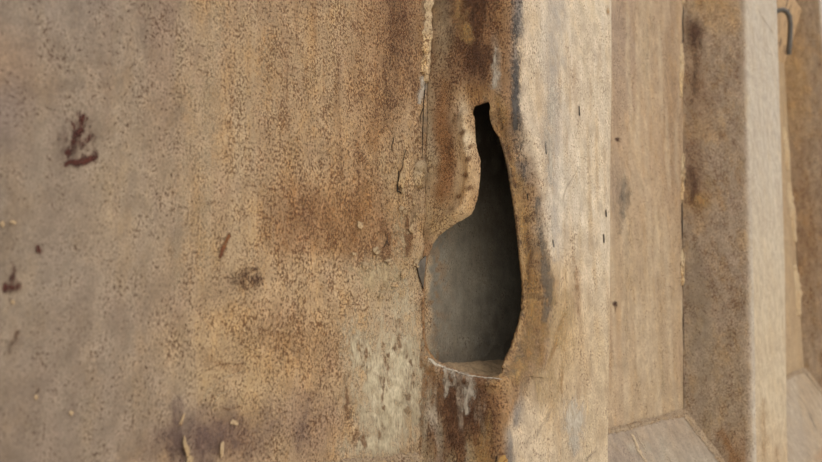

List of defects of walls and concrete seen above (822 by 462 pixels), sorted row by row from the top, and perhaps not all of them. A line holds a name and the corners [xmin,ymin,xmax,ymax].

corrosion [64,111,98,167]
corrosion [496,1,546,381]
corrosion [2,267,21,292]
corrosion [443,368,490,462]